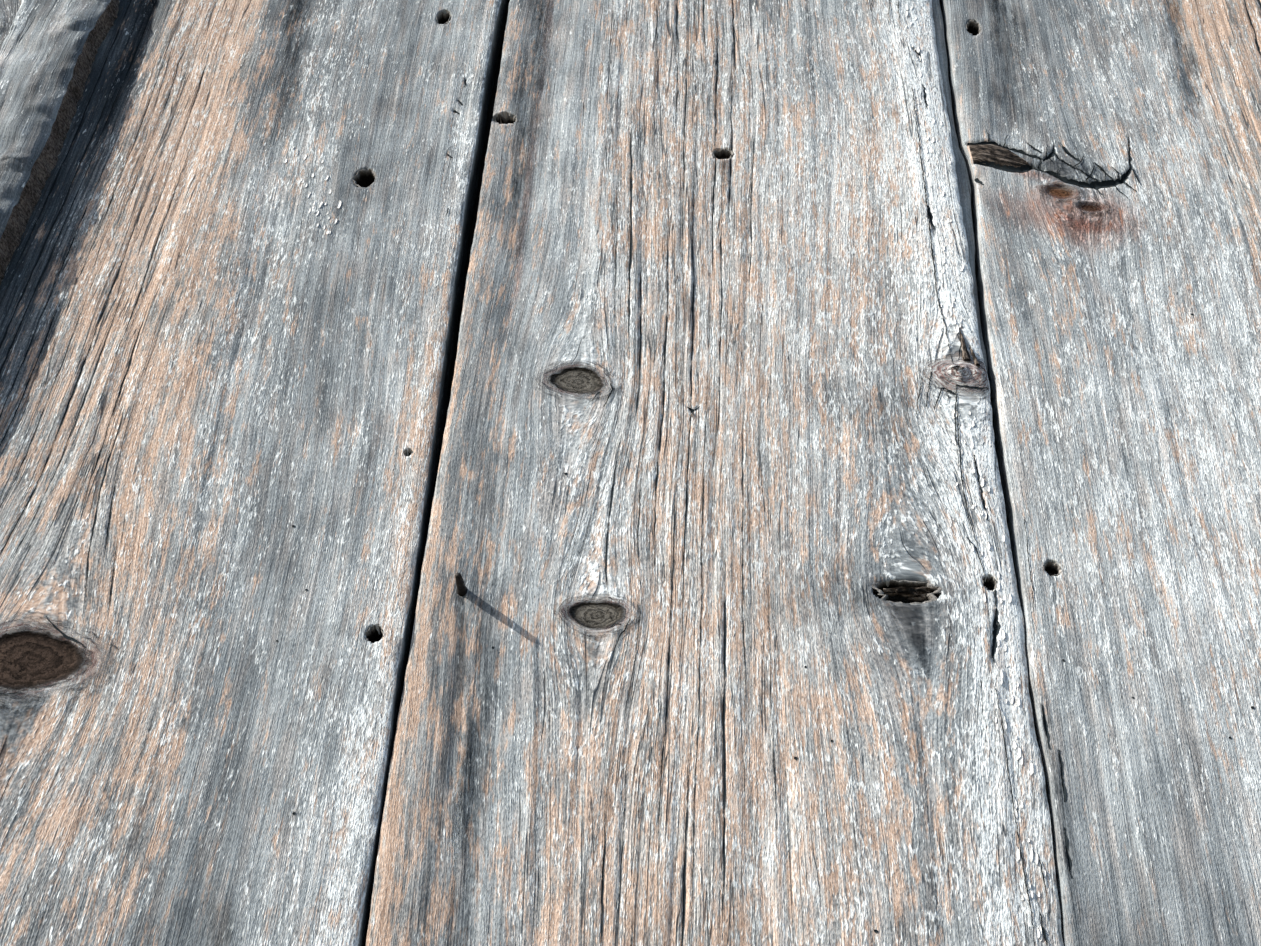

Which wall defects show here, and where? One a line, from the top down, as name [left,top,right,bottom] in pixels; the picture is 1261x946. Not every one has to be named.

crack [1244,0,1261,55]
crack [967,129,1140,198]
crack [866,0,1072,946]